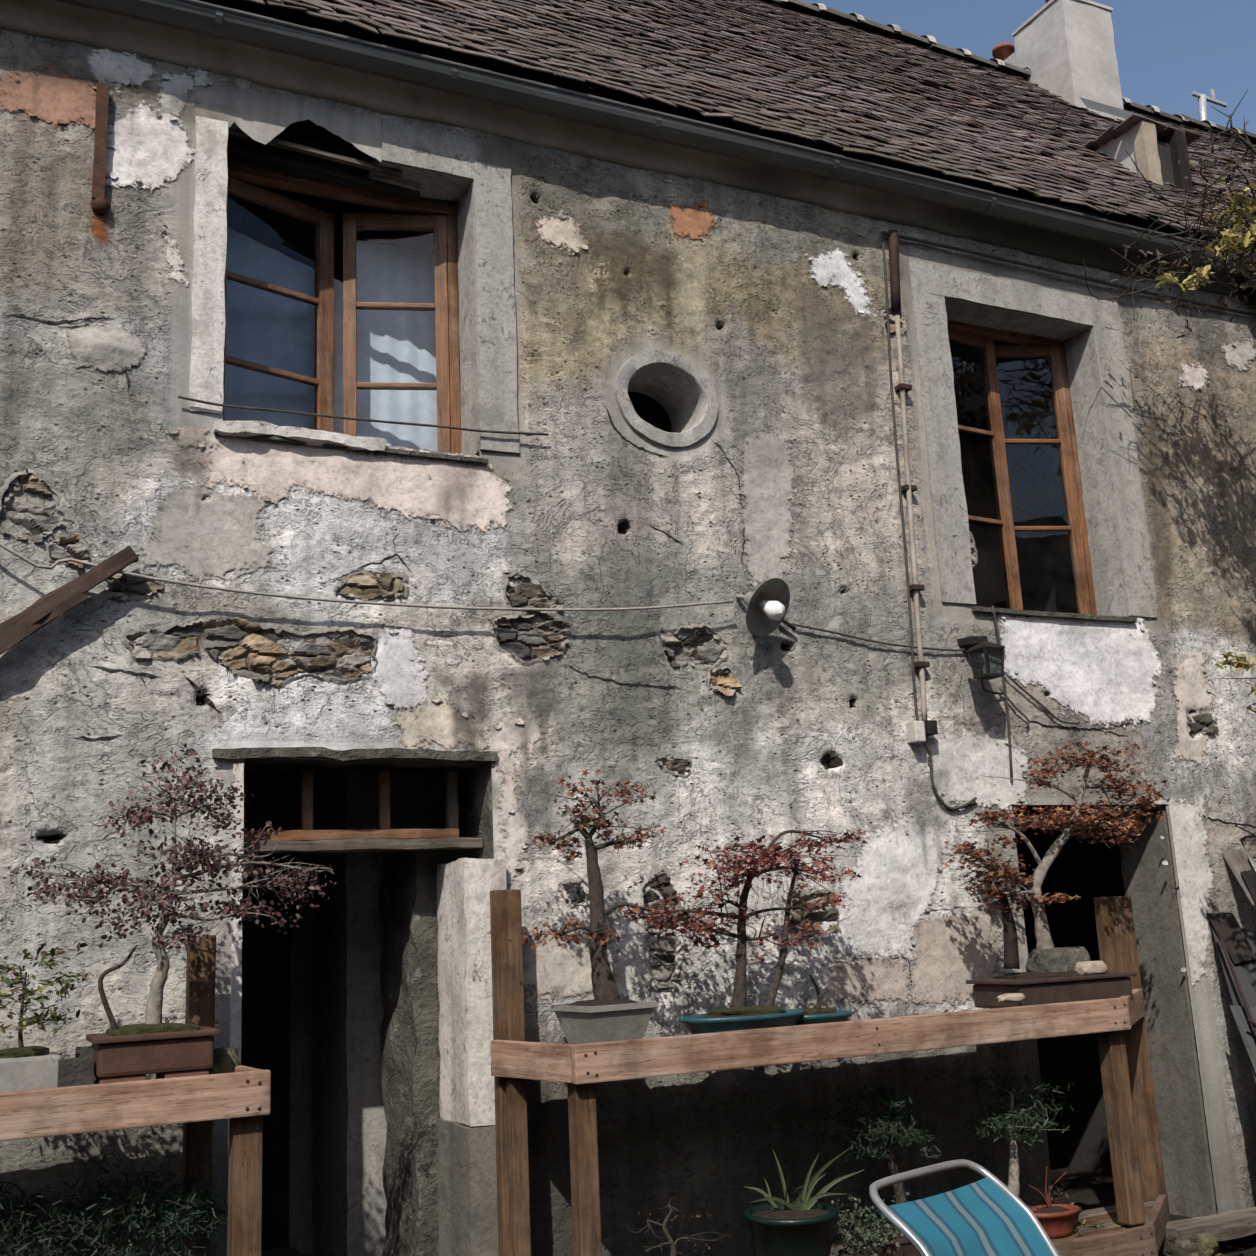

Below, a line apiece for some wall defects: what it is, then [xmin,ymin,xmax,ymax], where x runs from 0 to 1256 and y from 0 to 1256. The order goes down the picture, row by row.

peeling [0,48,223,193]
peeling [669,198,715,241]
peeling [806,248,906,338]
spalling [0,469,92,570]
peeling [165,425,512,533]
spalling [492,570,571,667]
spalling [655,623,743,696]
peeling [992,613,1219,767]
spalling [122,615,548,884]
spalling [639,864,688,992]